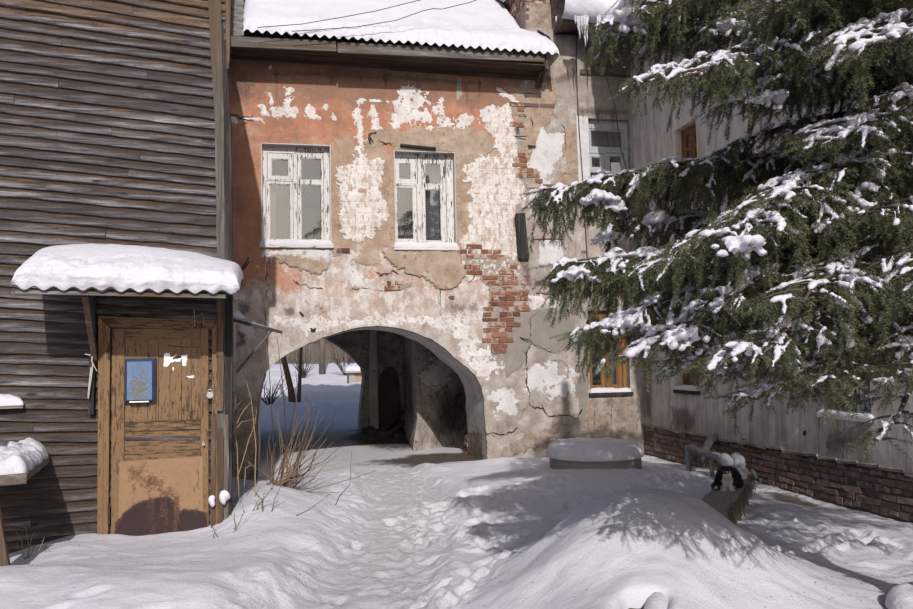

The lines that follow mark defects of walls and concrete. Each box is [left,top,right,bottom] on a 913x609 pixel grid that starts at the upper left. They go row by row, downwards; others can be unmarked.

peeling [231,86,337,124]
peeling [256,79,579,420]
crack [352,270,401,292]
peeling [236,321,256,342]
crack [485,314,628,457]